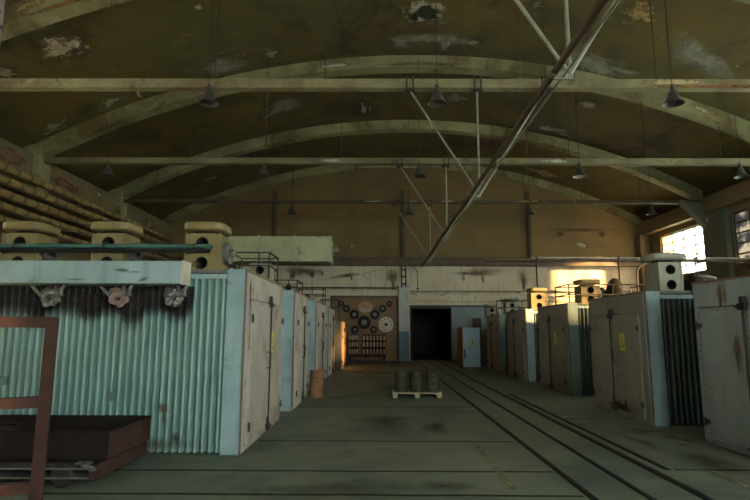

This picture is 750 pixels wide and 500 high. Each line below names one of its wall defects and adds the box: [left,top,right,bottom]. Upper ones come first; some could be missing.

spalling [401,0,447,24]
peeling [620,1,663,27]
spalling [36,34,89,63]
efflorescence [674,39,739,79]